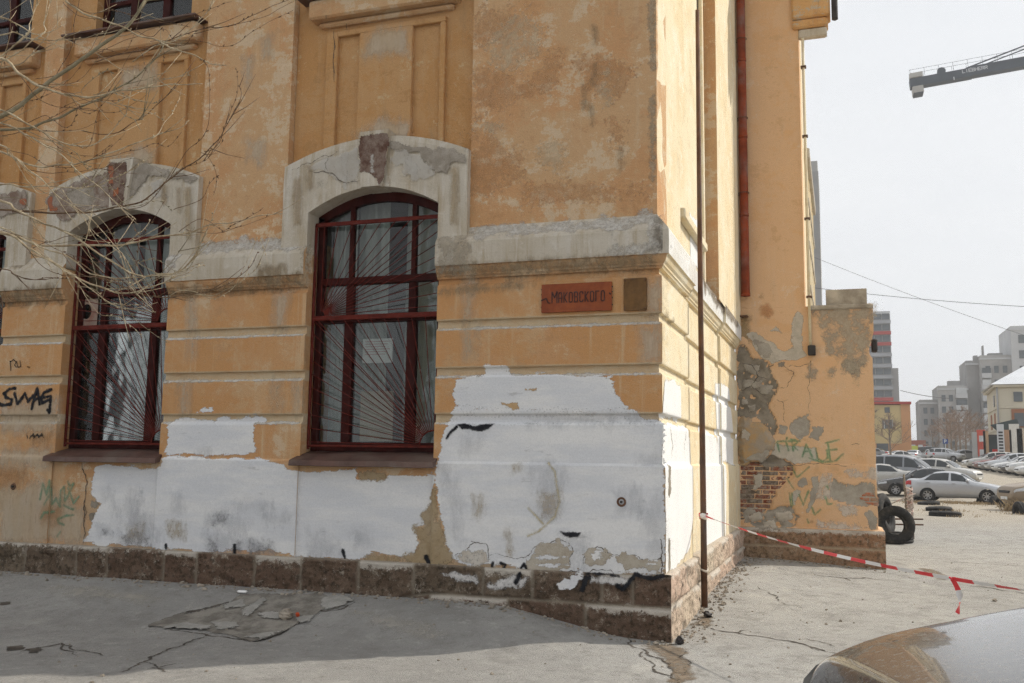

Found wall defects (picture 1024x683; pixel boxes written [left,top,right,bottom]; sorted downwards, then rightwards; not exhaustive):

flaking render [45,162,198,221]
crack [297,155,355,183]
flaking render [358,133,466,184]
crack [743,360,811,420]
flaking render [736,311,879,531]
flaking render [443,538,671,590]